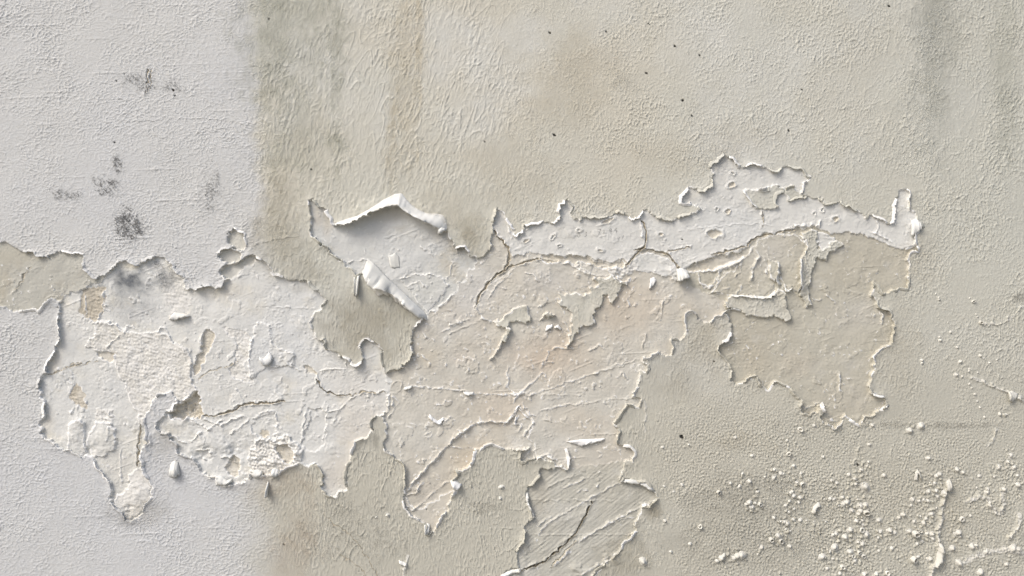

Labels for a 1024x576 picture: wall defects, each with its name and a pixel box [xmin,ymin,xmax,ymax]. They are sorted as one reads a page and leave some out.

mould [115,207,143,239]
crack [475,231,543,308]
peeling [0,152,924,576]